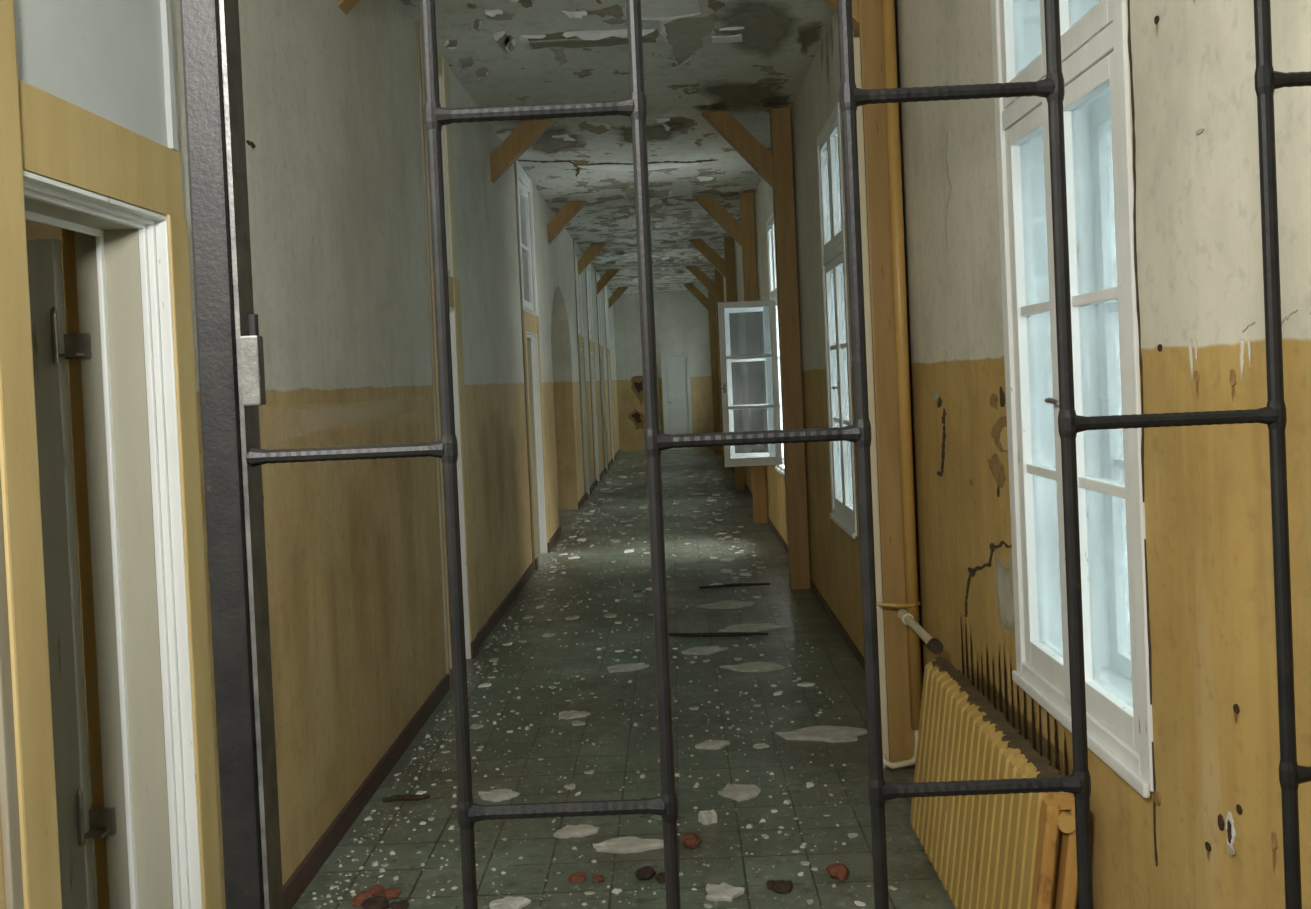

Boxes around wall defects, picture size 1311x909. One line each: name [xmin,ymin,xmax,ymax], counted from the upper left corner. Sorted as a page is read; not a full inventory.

peeling [467,0,745,68]
damp [723,2,819,53]
peeling [552,121,612,141]
peeling [655,117,702,147]
peeling [605,189,705,277]
crack [965,540,1012,617]